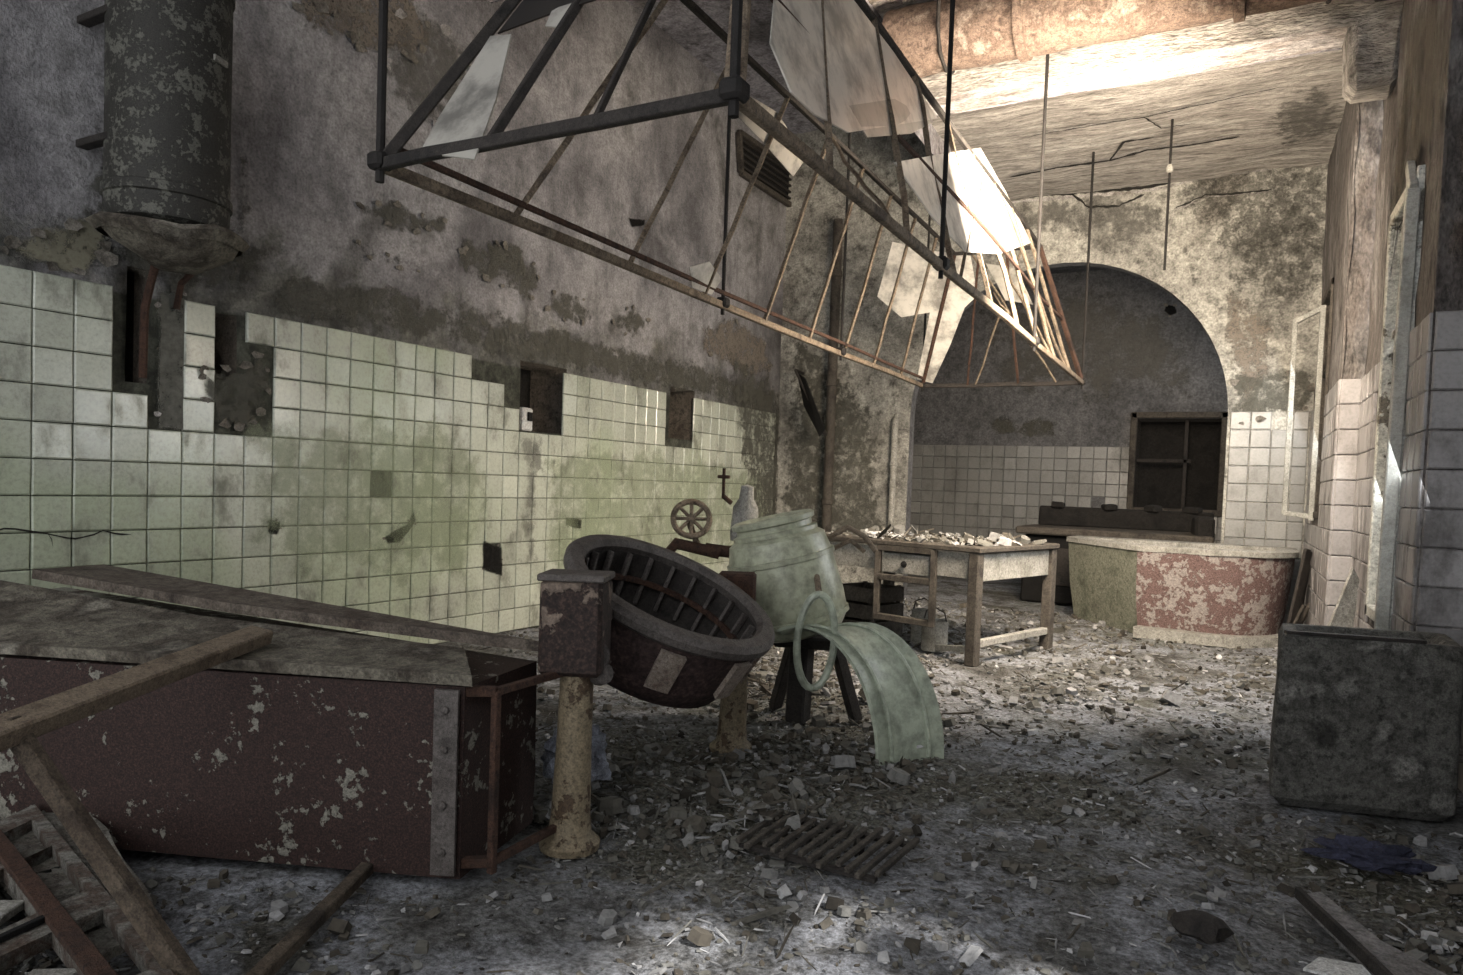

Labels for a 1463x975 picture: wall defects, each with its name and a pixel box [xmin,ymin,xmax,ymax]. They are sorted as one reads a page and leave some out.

peeling [292,0,472,126]
leakage [1275,87,1344,145]
spalling [198,351,272,431]